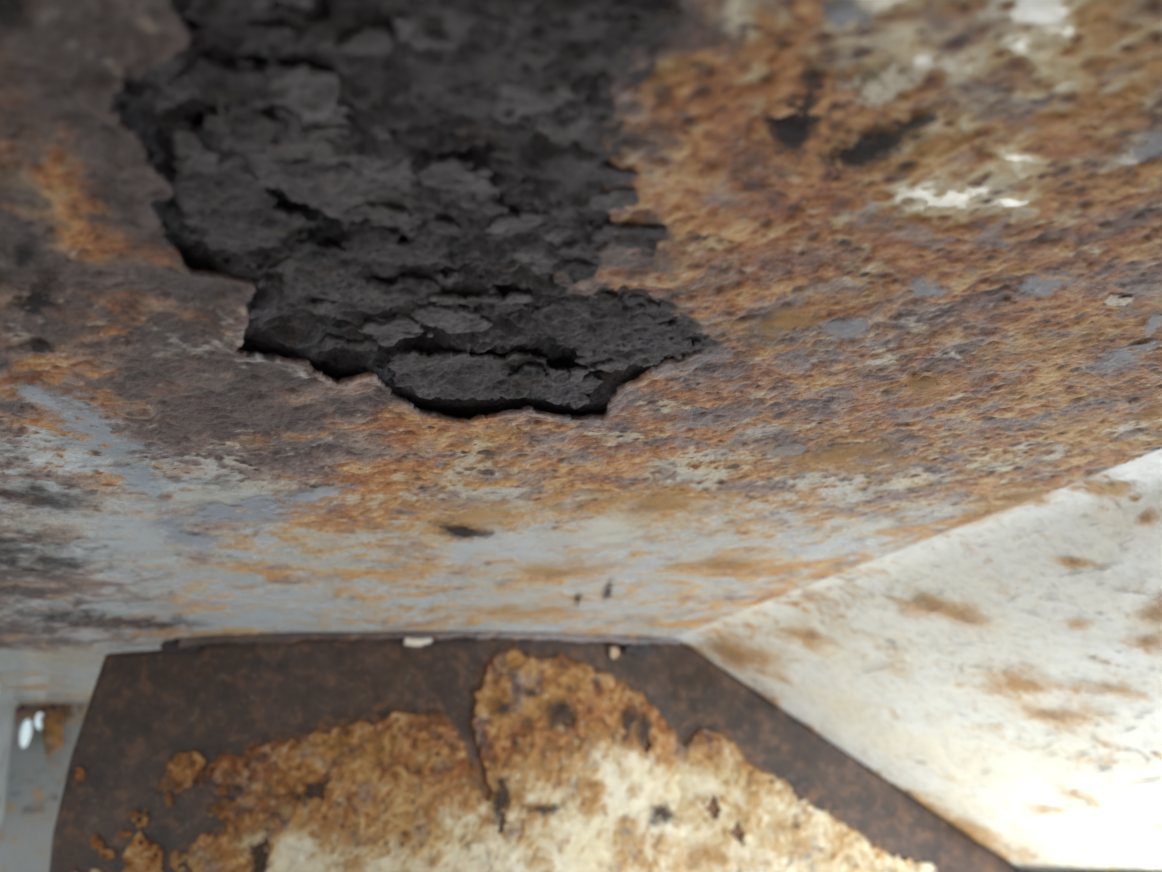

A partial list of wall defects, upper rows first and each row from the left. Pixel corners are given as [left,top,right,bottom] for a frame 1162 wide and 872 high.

rust [762,72,955,173]
rust [11,267,62,315]
rust [0,484,98,511]
rust [0,536,89,573]
rust [624,643,656,658]
rust [525,687,577,729]
rust [621,703,652,745]
rust [292,777,330,806]
rust [493,775,511,832]
rust [528,804,562,816]
rust [649,802,682,827]
rust [250,834,272,872]